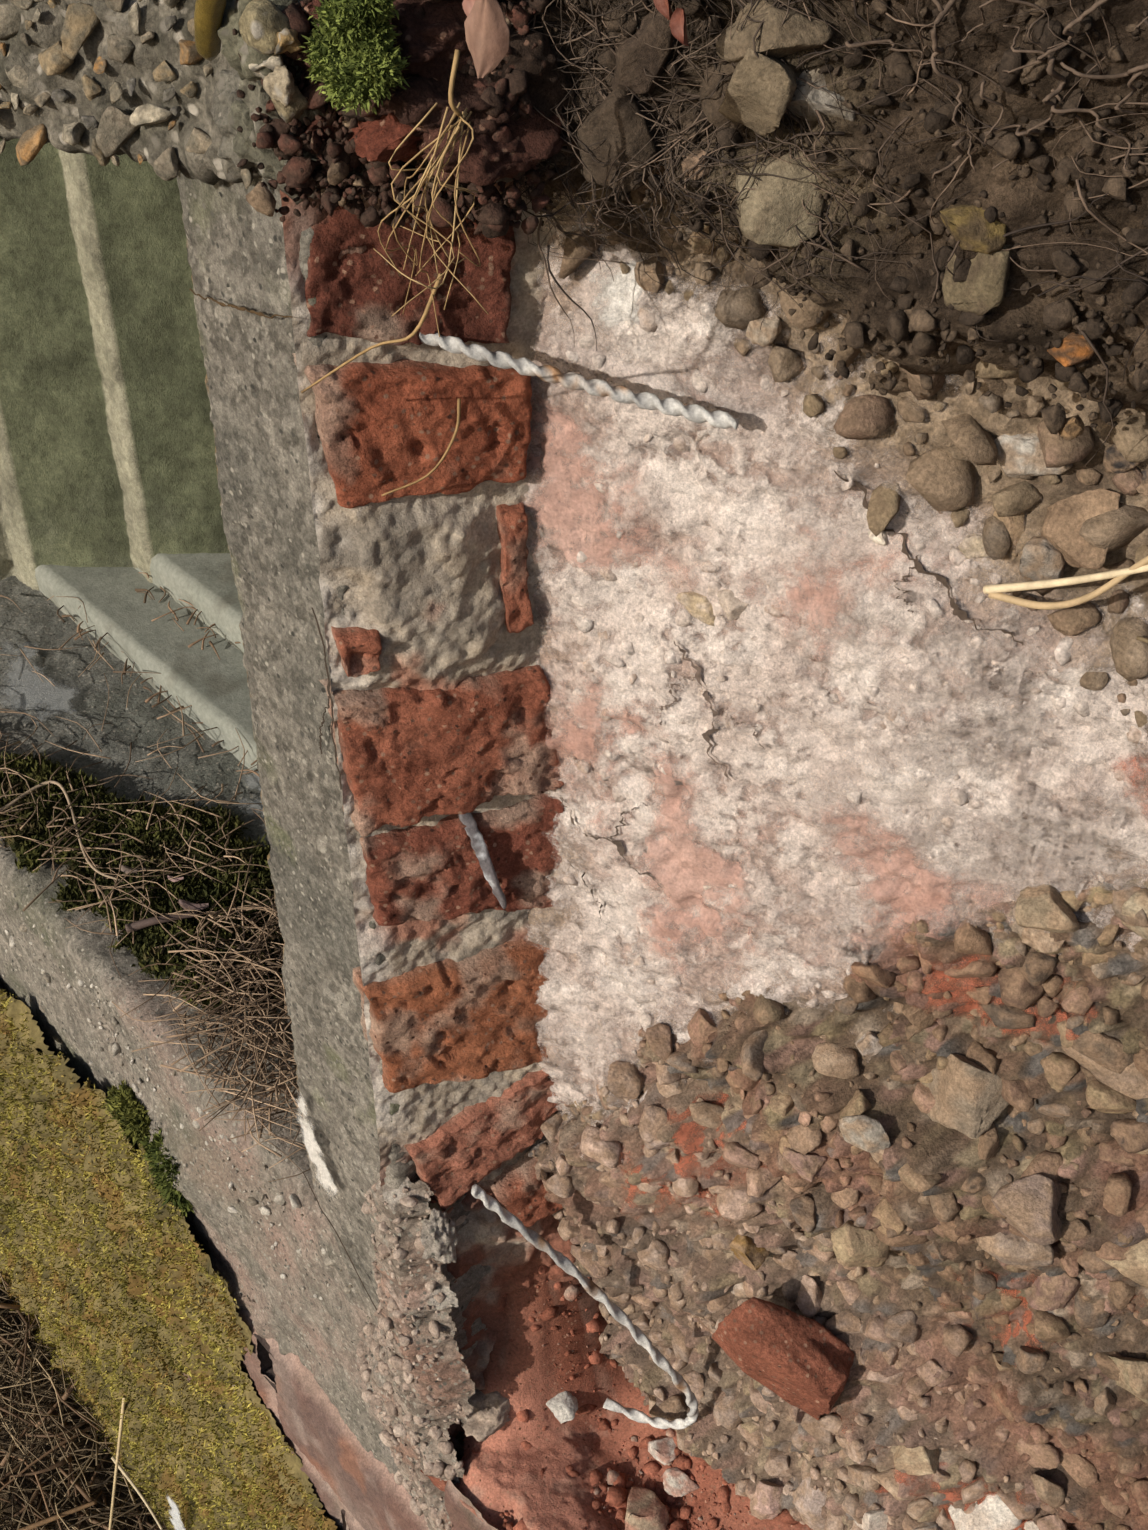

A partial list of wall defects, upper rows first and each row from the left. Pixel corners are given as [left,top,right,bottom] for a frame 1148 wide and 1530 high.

crack [834,470,1024,646]
crack [655,641,764,781]
spalling [356,1175,511,1530]